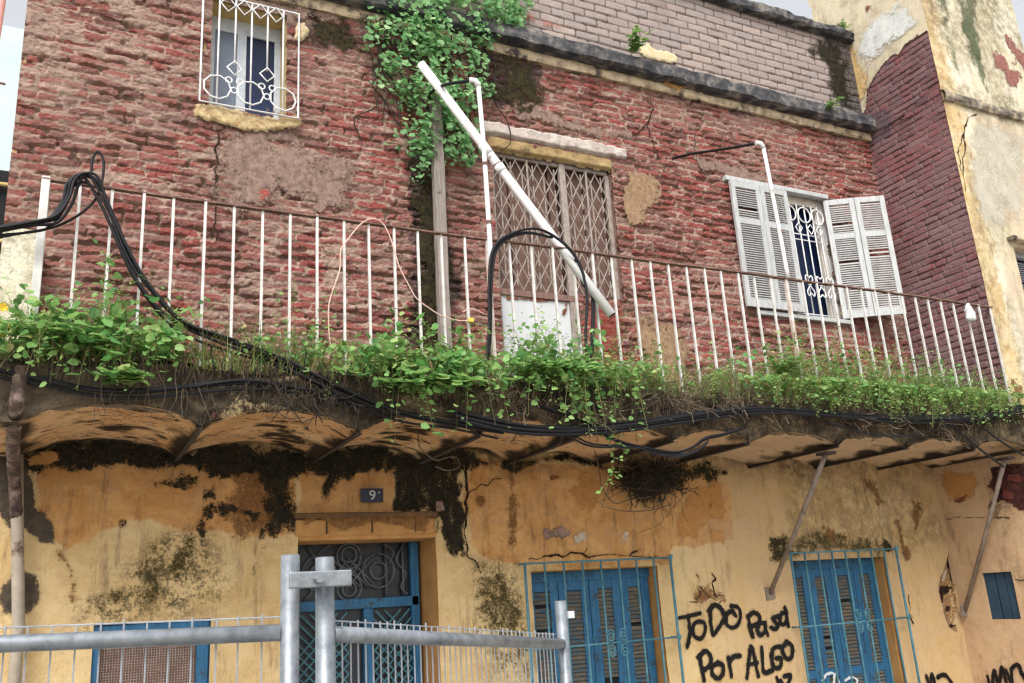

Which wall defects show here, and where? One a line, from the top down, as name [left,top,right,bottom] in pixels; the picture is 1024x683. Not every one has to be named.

leakage [491,54,545,115]
leakage [807,22,853,110]
leakage [962,12,980,59]
crack [210,129,220,242]
flaking render [849,30,1024,404]
crack [957,114,977,191]
leakage [26,440,439,549]
spalling [987,463,1024,515]
crack [529,547,658,560]
spalling [939,557,958,631]